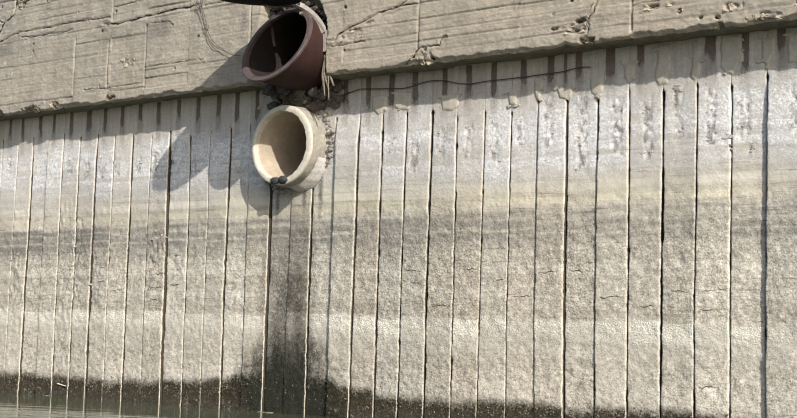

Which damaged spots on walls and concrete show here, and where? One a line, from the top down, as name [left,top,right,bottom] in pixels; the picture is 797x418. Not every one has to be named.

crack [0,0,223,42]
crack [334,0,416,46]
water stain [0,270,797,418]